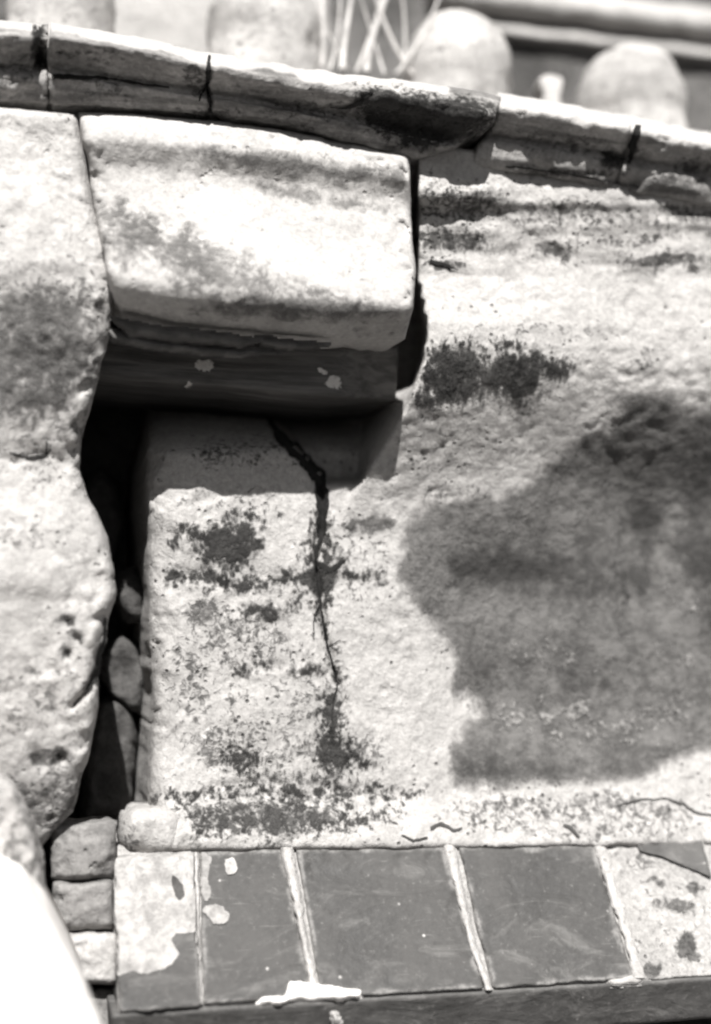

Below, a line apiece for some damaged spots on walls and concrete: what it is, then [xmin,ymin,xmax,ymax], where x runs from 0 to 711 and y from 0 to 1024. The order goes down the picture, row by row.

crack [198,55,213,114]
crack [506,124,641,188]
leakage [409,334,581,422]
leakage [161,499,283,580]
crack [267,419,346,723]
leakage [293,532,345,621]
leakage [399,392,711,787]
leakage [279,661,342,678]
leakage [221,689,383,791]
peeling [172,876,185,900]
peeling [643,963,662,977]
peeling [675,932,696,956]